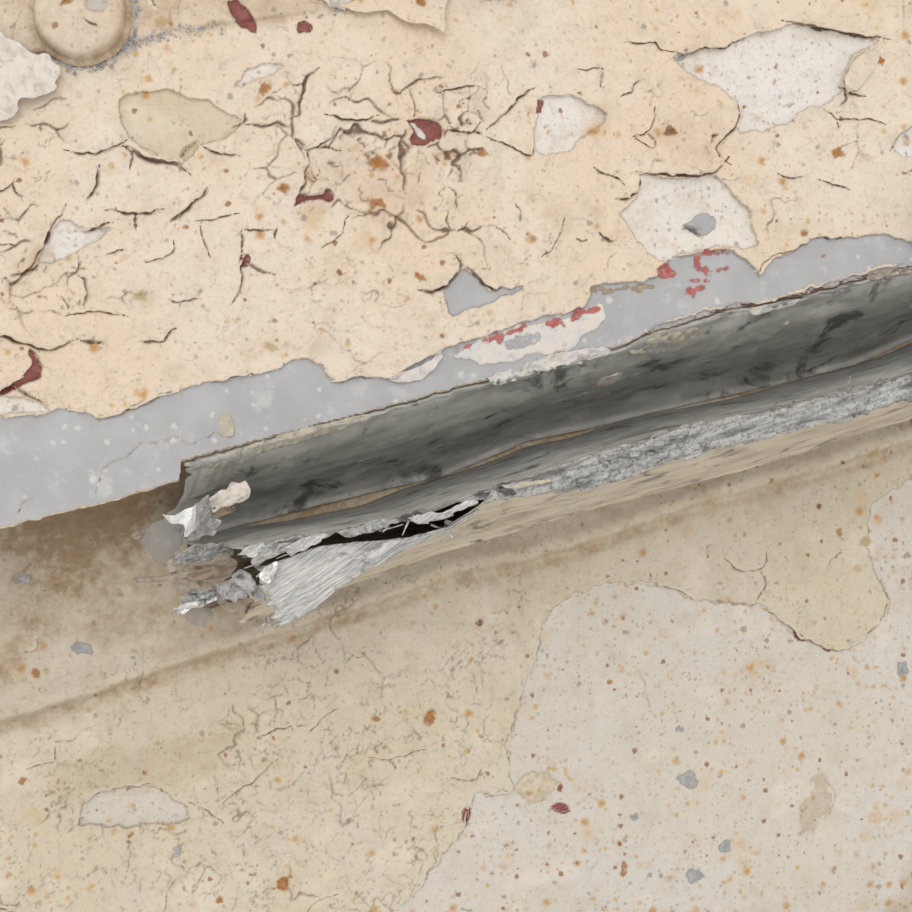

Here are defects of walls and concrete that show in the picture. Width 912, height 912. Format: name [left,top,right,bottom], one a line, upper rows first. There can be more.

peeling [323,0,448,33]
peeling [0,31,61,121]
peeling [119,89,241,163]
crack [0,67,415,306]
crack [446,82,537,155]
crack [593,95,740,200]
peeling [674,24,880,134]
crack [0,275,129,350]
peeling [0,174,912,526]
crack [418,255,506,293]
crack [539,216,617,256]
peeling [393,480,912,912]